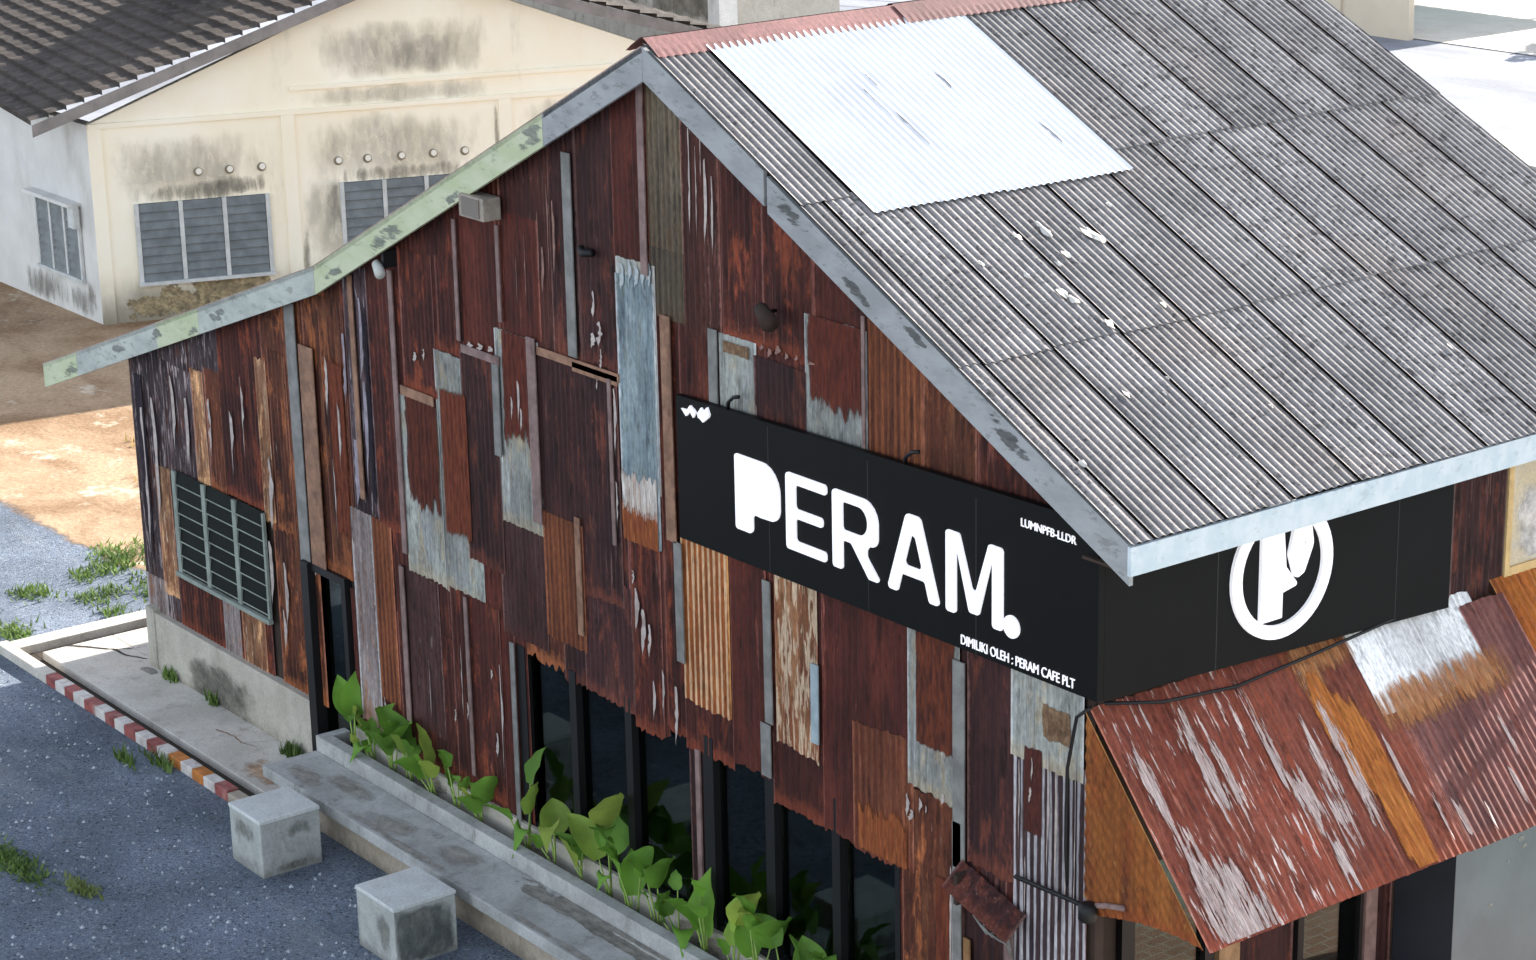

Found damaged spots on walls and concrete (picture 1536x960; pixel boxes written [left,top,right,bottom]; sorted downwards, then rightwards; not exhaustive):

water stain [192,180,243,197]
rust [327,359,352,540]
rust [404,389,472,543]
rust [500,329,530,450]
rust [622,499,659,552]
water stain [1519,488,1536,555]
rust [916,631,954,757]
rust [1024,704,1071,837]
rust [1287,636,1508,868]
rust [857,800,907,870]
rust [936,875,952,960]